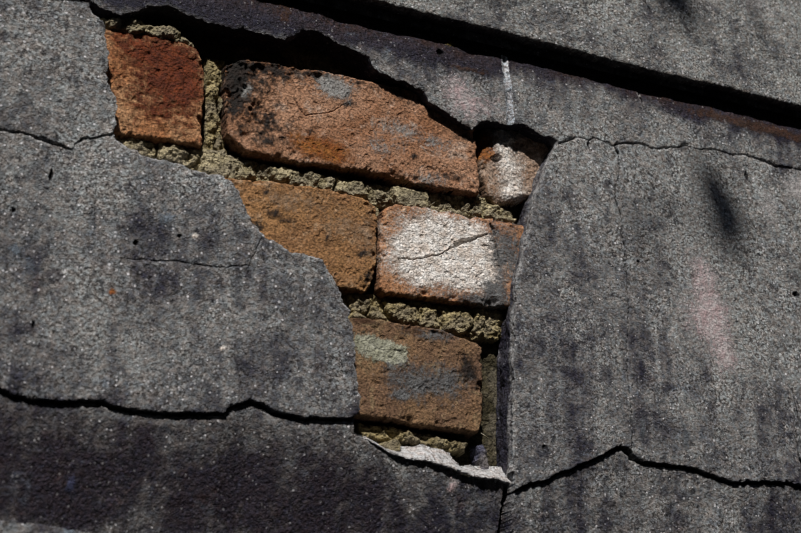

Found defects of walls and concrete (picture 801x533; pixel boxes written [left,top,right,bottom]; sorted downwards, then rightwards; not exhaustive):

spalling [88,1,558,485]
crack [497,438,689,533]
crack [707,477,787,486]